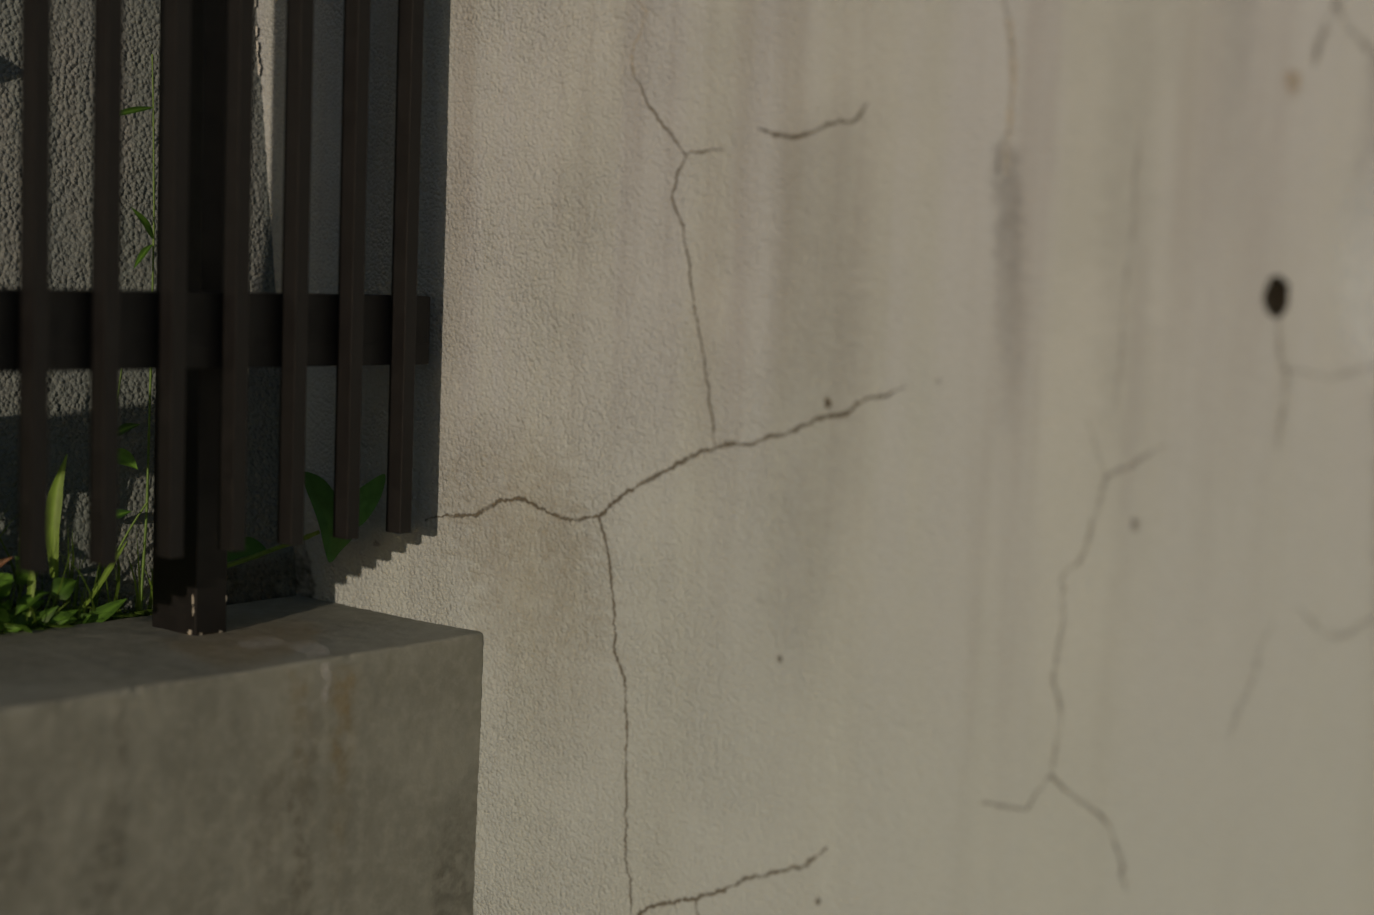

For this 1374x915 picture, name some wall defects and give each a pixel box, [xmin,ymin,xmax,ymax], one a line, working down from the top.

crack [425,1,906,915]